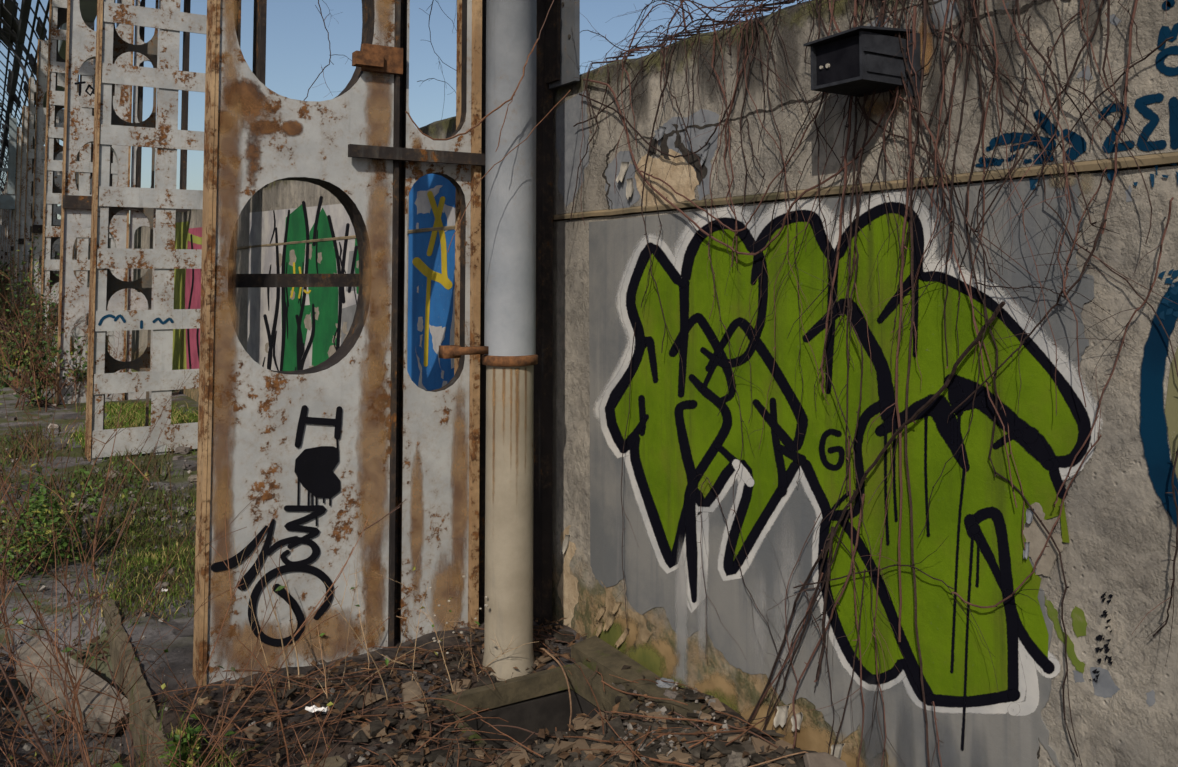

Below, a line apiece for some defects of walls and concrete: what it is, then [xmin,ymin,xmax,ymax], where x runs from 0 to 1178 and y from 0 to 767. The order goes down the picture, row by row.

rust [224,0,236,36]
flaking render [605,109,720,209]
rust [211,54,391,676]
rust [492,367,527,483]
rust [411,453,423,588]
rust [433,396,468,631]
flaking render [557,525,579,628]
spalling [434,581,712,752]
spalling [774,703,805,733]